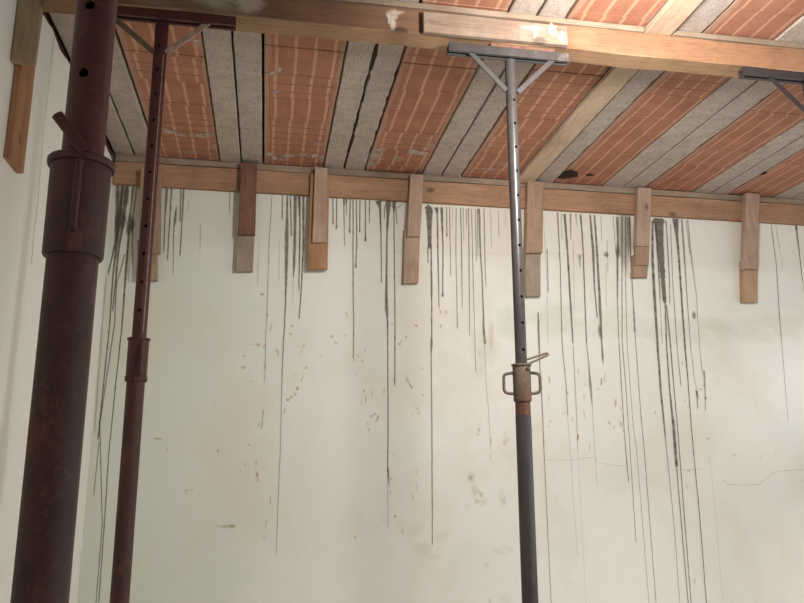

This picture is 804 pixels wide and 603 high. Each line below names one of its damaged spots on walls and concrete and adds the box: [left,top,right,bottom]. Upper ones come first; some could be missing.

leakage [94,185,137,602]
leakage [163,188,184,263]
leakage [282,195,305,374]
leakage [333,198,397,393]
leakage [425,205,451,422]
leakage [460,208,486,343]
leakage [557,213,604,415]
leakage [616,217,656,599]
leakage [651,218,707,603]